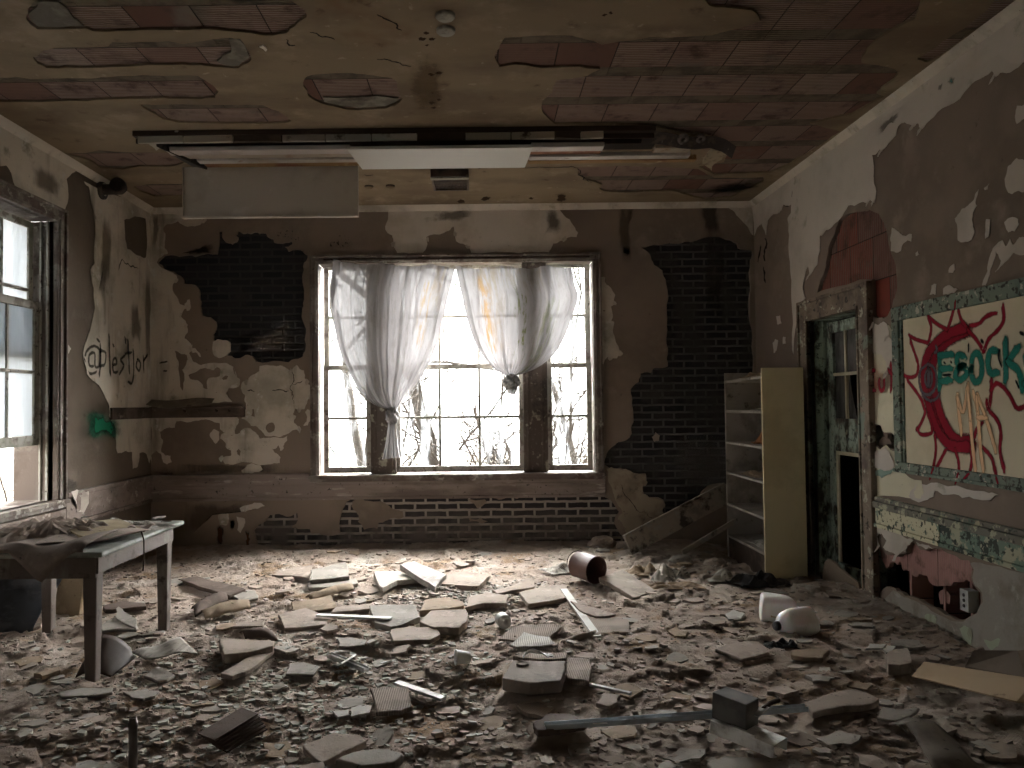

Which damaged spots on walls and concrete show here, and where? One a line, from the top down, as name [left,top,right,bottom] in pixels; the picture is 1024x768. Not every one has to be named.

spalling [0,75,217,100]
spalling [68,181,310,473]
spalling [303,73,401,108]
spalling [218,237,753,546]
spalling [495,0,1024,364]
peeling [874,528,1024,651]